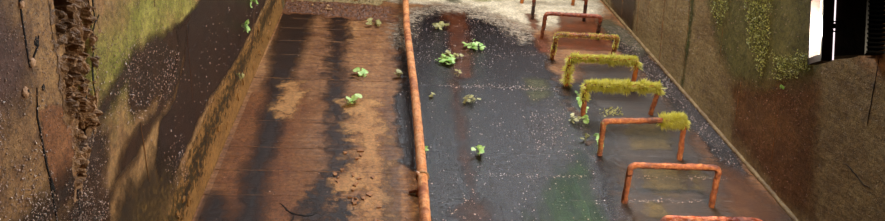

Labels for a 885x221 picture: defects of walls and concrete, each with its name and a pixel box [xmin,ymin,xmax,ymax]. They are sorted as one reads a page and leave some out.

crack [19,0,39,67]
rust [556,16,612,51]
crack [36,88,58,221]
spalling [48,0,103,202]
water stain [390,0,751,221]